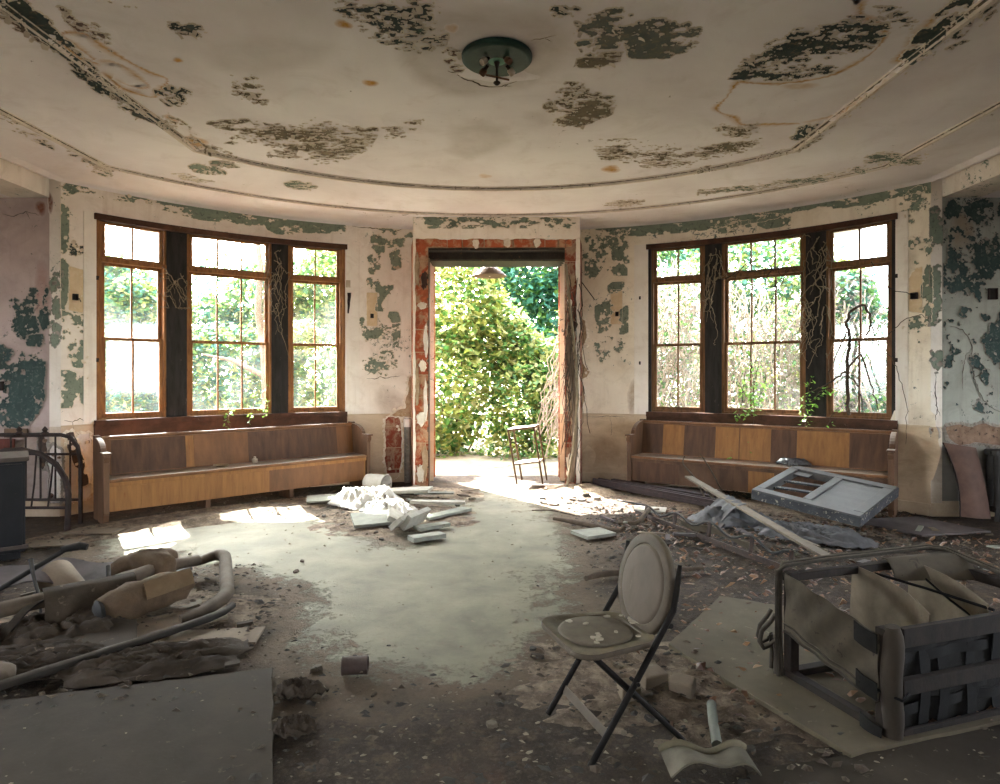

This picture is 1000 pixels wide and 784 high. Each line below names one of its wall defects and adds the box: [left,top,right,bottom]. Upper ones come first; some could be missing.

water stain [48,29,170,98]
peeling [0,0,425,183]
peeling [332,0,465,73]
peeling [542,81,617,129]
peeling [549,5,703,70]
peeling [593,93,880,174]
water stain [709,0,951,128]
peeling [727,0,1000,82]
peeling [0,183,347,505]
peeling [359,228,413,377]
peeling [423,182,1000,449]
spalling [382,375,411,480]